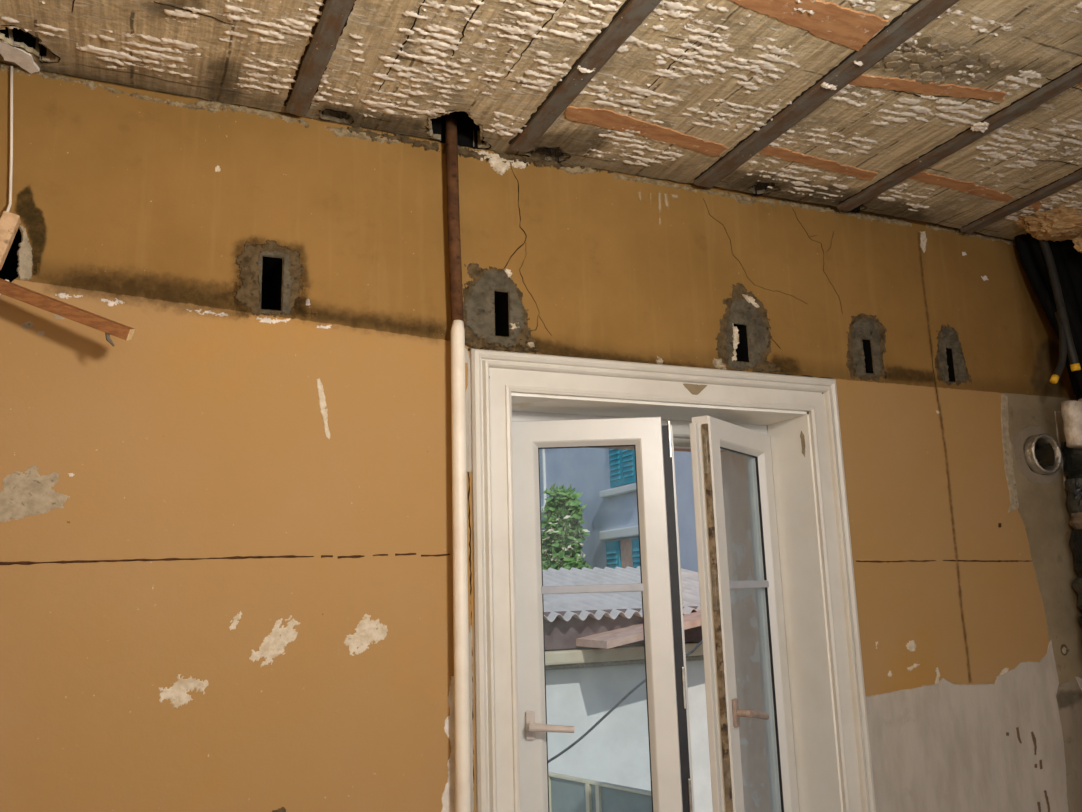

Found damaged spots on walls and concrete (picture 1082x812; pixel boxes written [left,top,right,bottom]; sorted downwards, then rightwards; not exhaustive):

leakage [16,187,46,275]
crack [703,199,807,304]
peeling [316,378,330,439]
peeling [0,465,75,522]
peeling [229,611,242,630]
peeling [249,615,301,667]
peeling [344,614,388,656]
flaking render [865,393,1082,812]
peeling [159,674,209,708]